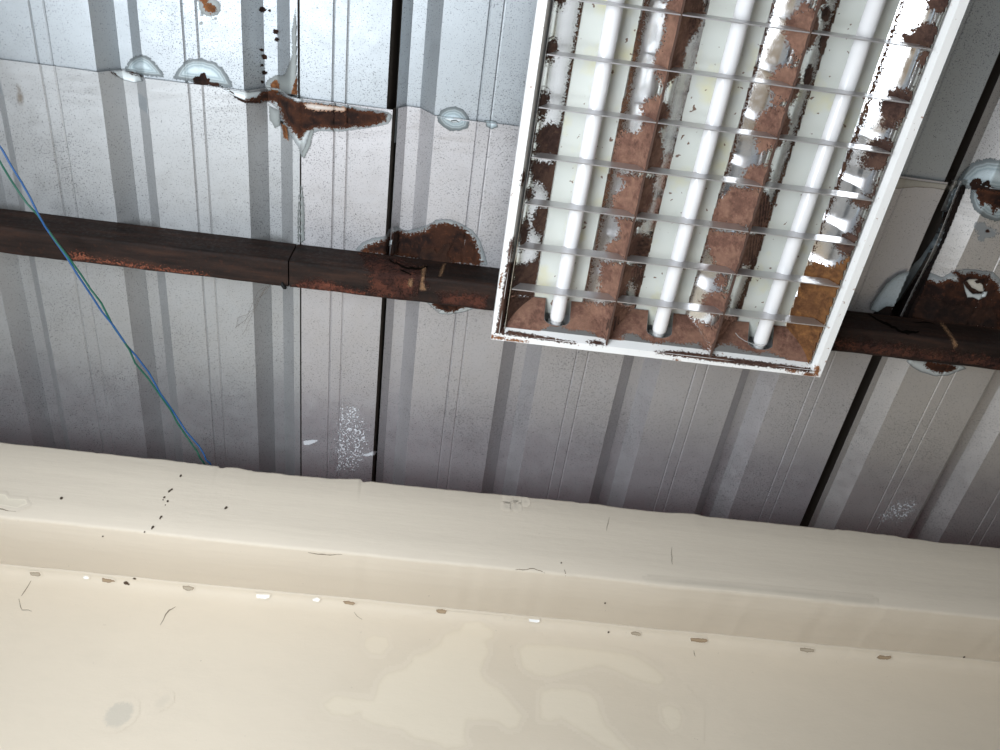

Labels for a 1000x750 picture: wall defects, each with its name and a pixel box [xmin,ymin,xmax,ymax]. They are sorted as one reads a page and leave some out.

corrosion [196,0,221,25]
corrosion [245,12,392,158]
corrosion [292,0,948,377]
corrosion [970,188,1000,221]
corrosion [68,248,207,276]
corrosion [832,269,1000,376]
water stain [302,611,705,750]